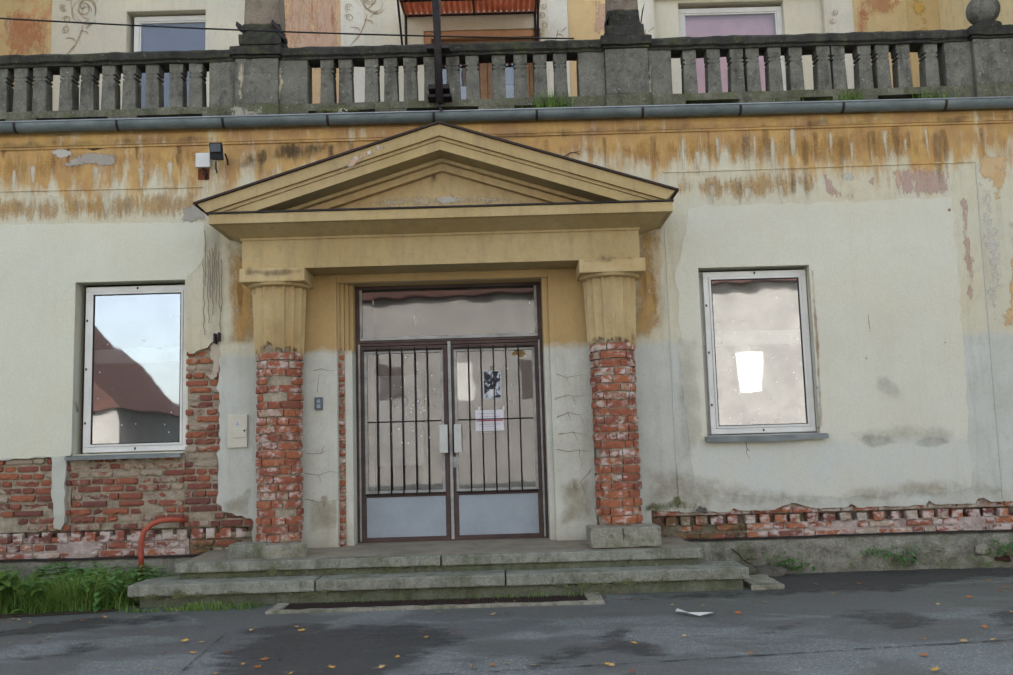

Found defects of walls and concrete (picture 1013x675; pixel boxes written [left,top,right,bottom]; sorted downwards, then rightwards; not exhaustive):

water stain [0,195,57,217]
water stain [68,196,190,216]
water stain [705,175,793,200]
peeling [894,170,947,196]
peeling [980,155,1007,199]
peeling [948,199,974,300]
peeling [1004,259,1013,327]
flaking render [0,342,304,559]
crack [556,374,591,497]
flaking render [589,342,1013,539]